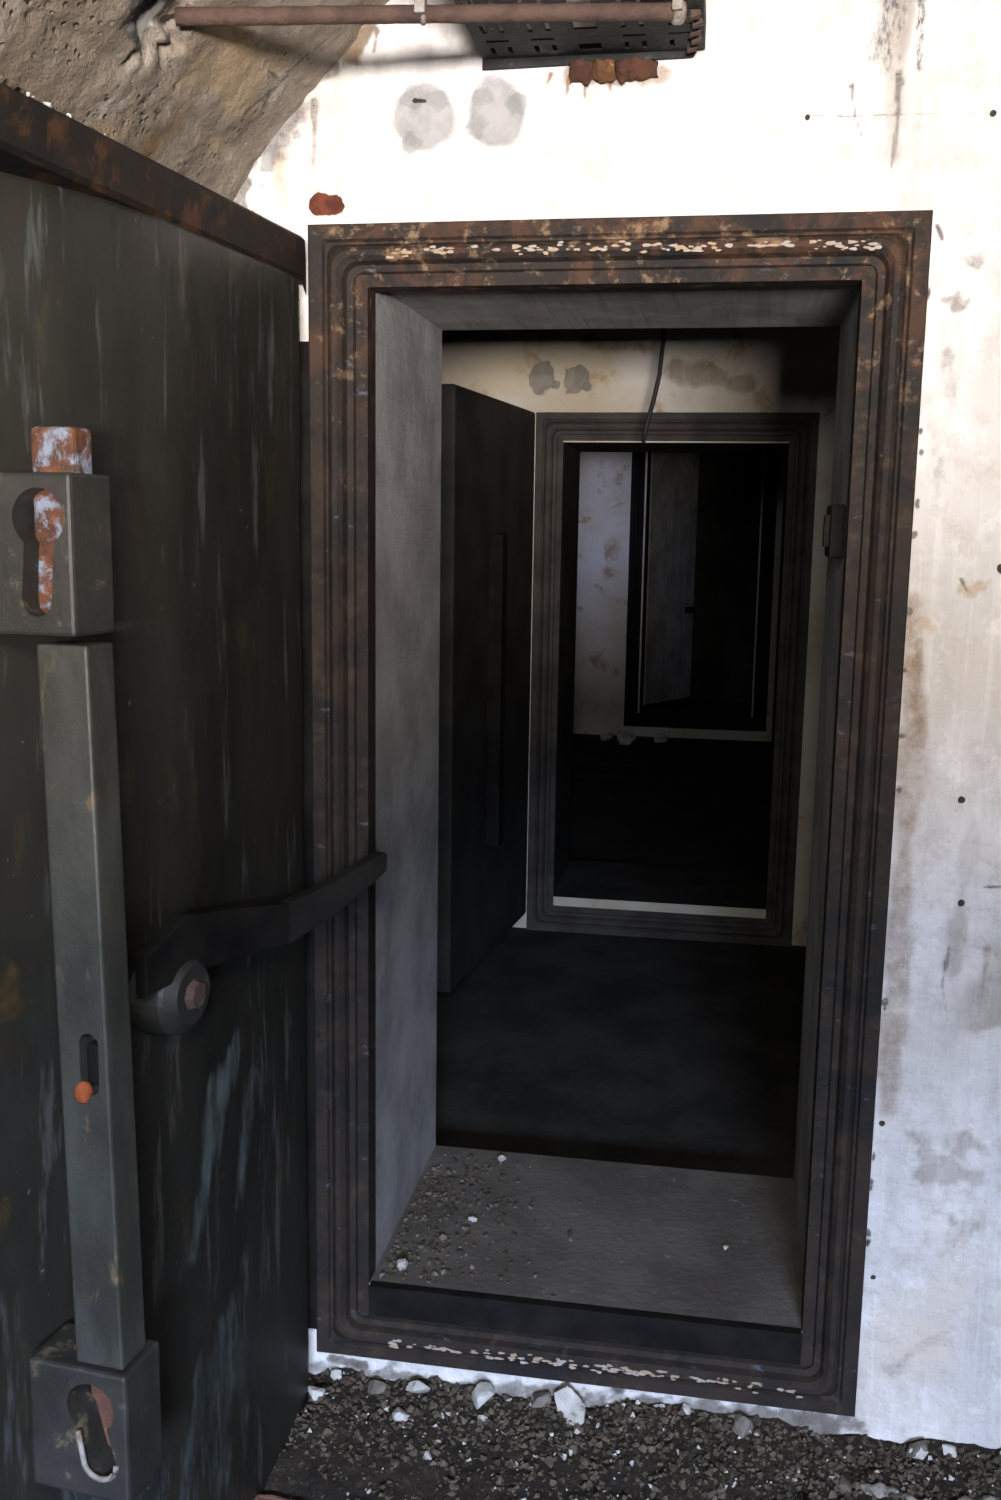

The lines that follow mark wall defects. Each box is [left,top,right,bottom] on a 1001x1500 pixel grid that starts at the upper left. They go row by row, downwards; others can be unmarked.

corrosion [309,192,345,215]